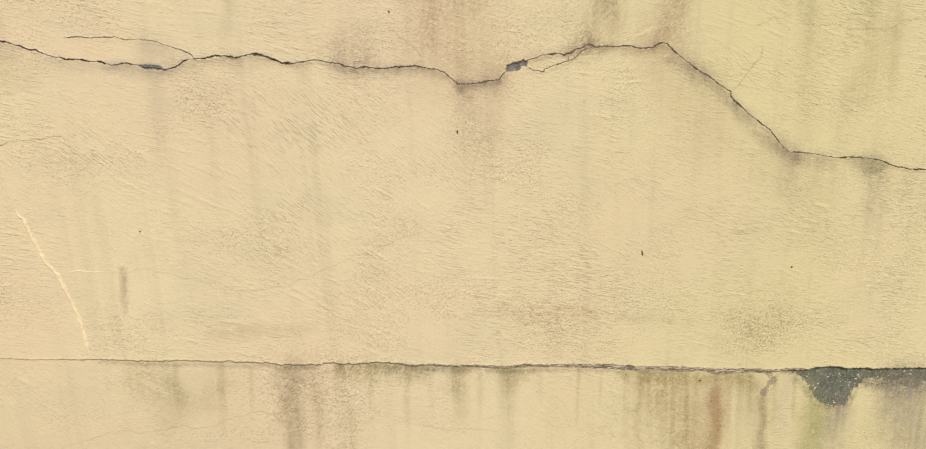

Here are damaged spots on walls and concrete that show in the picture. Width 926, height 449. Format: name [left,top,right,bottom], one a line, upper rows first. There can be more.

crack [0,32,505,92]
crack [526,42,926,170]
flaking render [792,366,926,407]